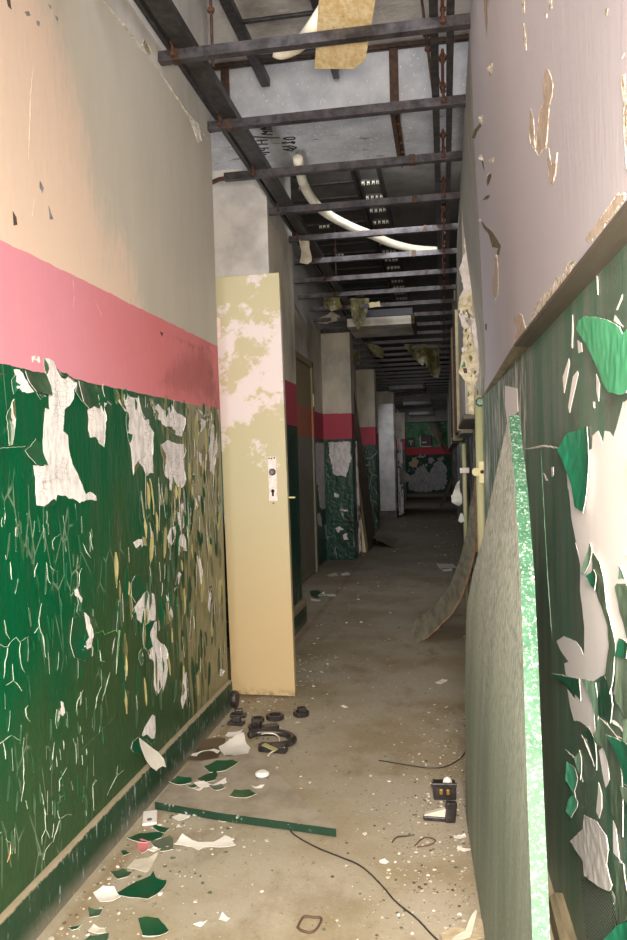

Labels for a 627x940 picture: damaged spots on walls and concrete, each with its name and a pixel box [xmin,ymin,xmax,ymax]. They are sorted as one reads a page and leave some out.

peeling [529,68,558,185]
peeling [586,192,627,242]
peeling [513,261,575,342]
peeling [505,386,518,422]
peeling [315,441,352,540]
peeling [408,454,448,492]
peeling [0,355,225,837]
peeling [543,295,627,940]
crack [0,517,120,860]